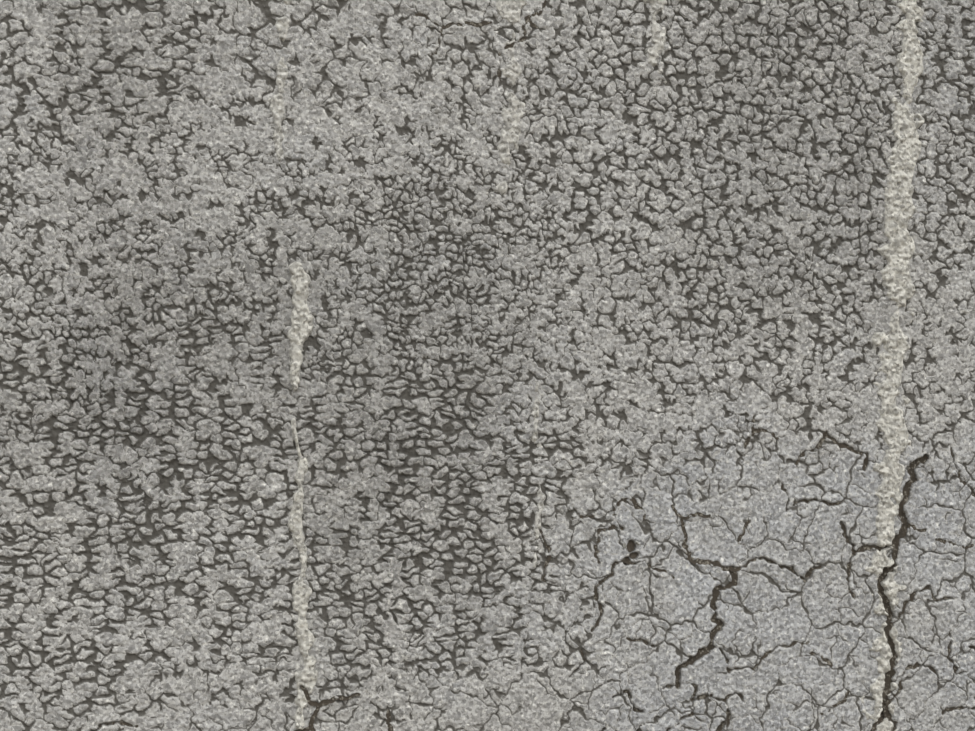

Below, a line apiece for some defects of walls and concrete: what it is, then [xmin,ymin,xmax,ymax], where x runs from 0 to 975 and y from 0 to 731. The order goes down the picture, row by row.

crack [744,415,778,447]
crack [795,431,868,471]
crack [781,448,975,731]
crack [572,497,833,731]
crack [92,720,138,731]
crack [294,685,360,731]
crack [385,709,393,731]